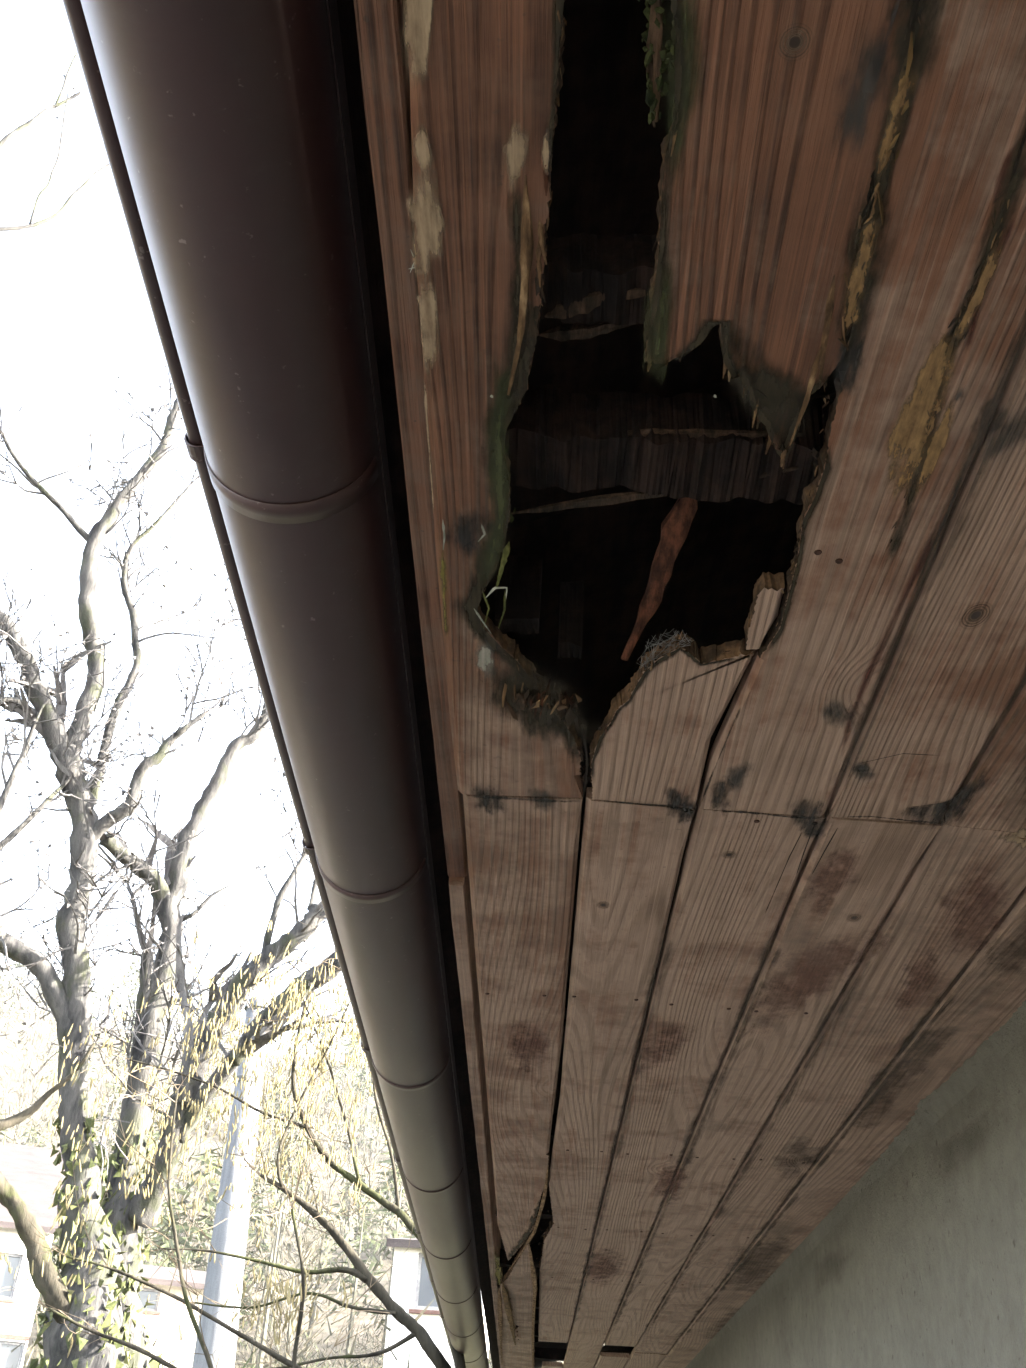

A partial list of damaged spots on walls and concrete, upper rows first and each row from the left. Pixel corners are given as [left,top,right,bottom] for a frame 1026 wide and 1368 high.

peeling [405,0,433,75]
peeling [408,129,444,367]
peeling [424,387,434,508]
damp [455,513,493,555]
damp [477,647,587,739]
peeling [502,683,582,721]